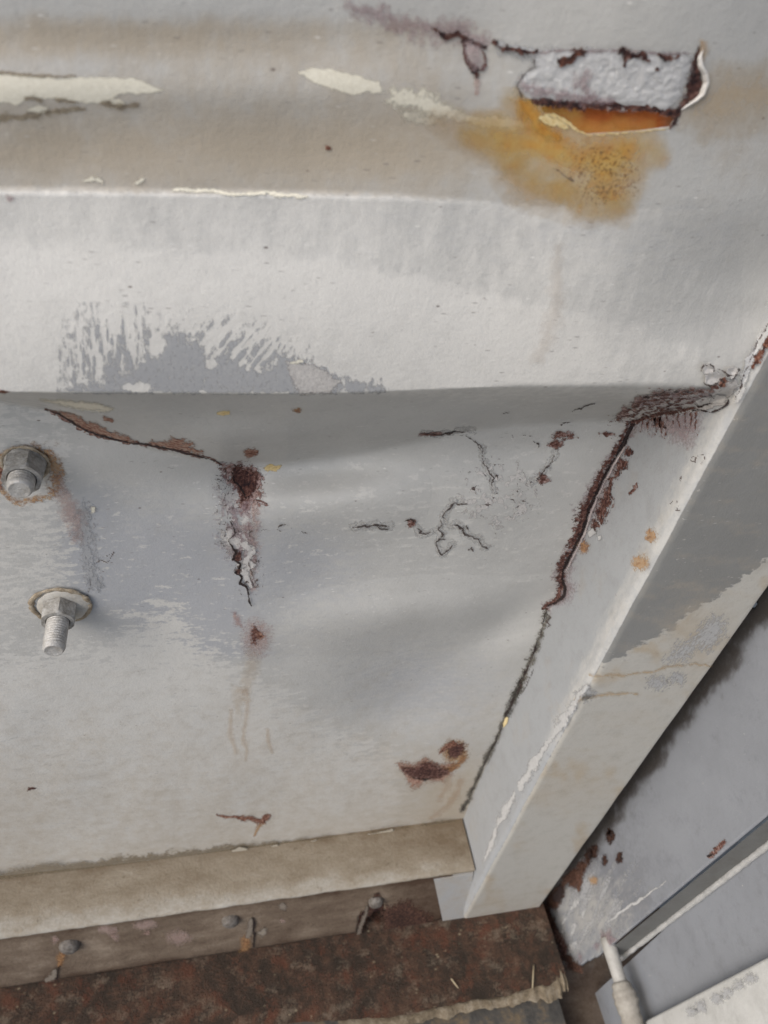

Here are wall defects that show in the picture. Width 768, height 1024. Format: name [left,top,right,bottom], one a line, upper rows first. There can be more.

peeling [0,70,164,122]
peeling [297,68,524,132]
peeling [539,113,669,136]
rust [462,42,768,213]
peeling [56,302,386,396]
crack [45,409,223,466]
crack [523,403,615,486]
rust [541,336,768,610]
crack [350,498,490,557]
crack [459,610,551,813]
rust [395,740,468,791]
rust [543,828,623,974]